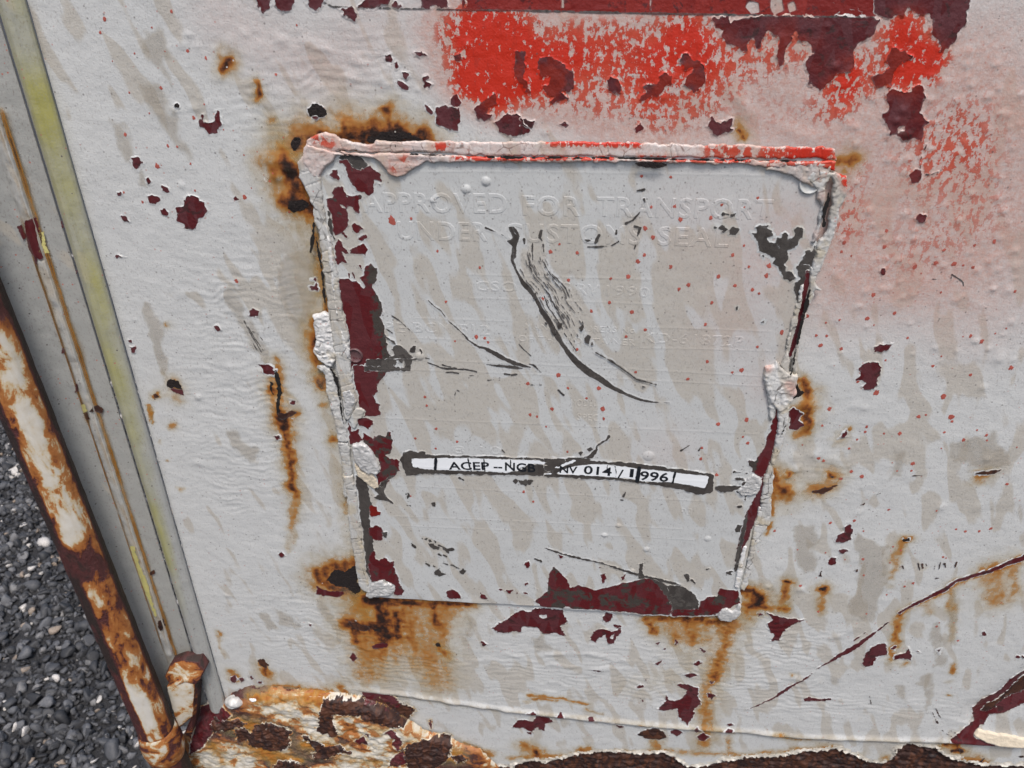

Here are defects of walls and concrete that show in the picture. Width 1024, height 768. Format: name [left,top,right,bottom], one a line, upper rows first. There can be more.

peeling [382,48,537,139]
peeling [710,0,972,93]
peeling [868,42,941,185]
peeling [129,155,210,232]
corrosion [256,100,436,407]
corrosion [0,245,193,768]
corrosion [265,356,301,530]
peeling [316,150,817,649]
corrosion [790,376,817,439]
corrosion [247,662,349,709]
corrosion [307,556,478,688]
spalling [949,654,1024,748]